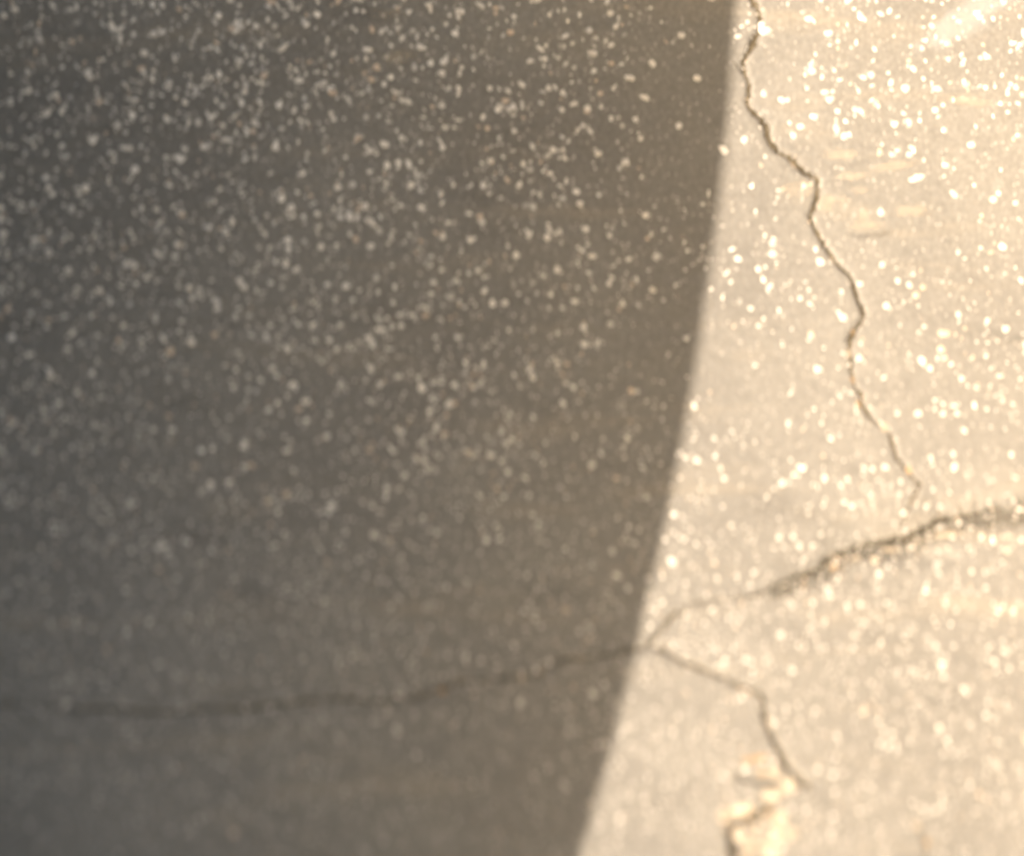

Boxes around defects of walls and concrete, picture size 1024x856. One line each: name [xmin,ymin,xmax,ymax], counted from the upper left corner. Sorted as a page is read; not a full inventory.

crack [735,0,922,532]
crack [0,502,1024,789]